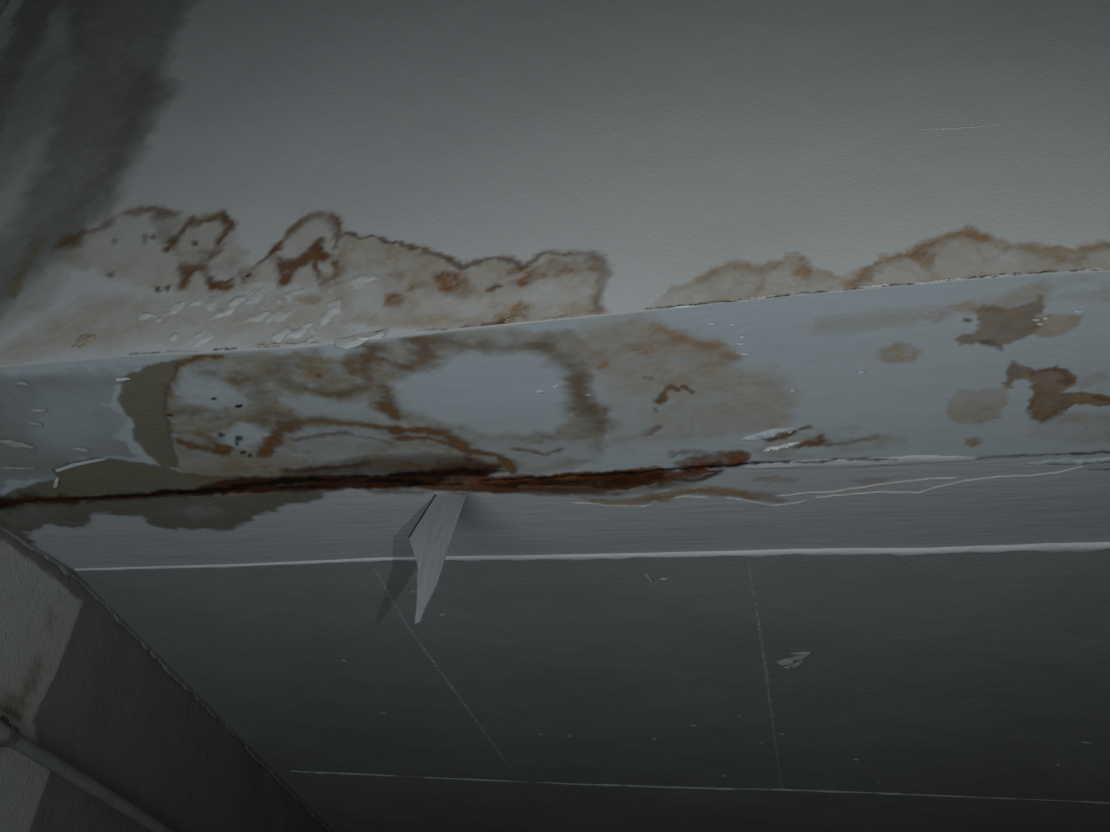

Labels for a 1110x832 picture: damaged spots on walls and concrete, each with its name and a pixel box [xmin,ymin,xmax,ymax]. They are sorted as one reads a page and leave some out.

water stain [0,0,158,300]
water stain [156,212,233,290]
water stain [266,238,338,285]
water stain [429,253,481,291]
water stain [966,306,1042,336]
water stain [165,355,223,400]
crack [0,451,824,509]
crack [1026,452,1110,465]